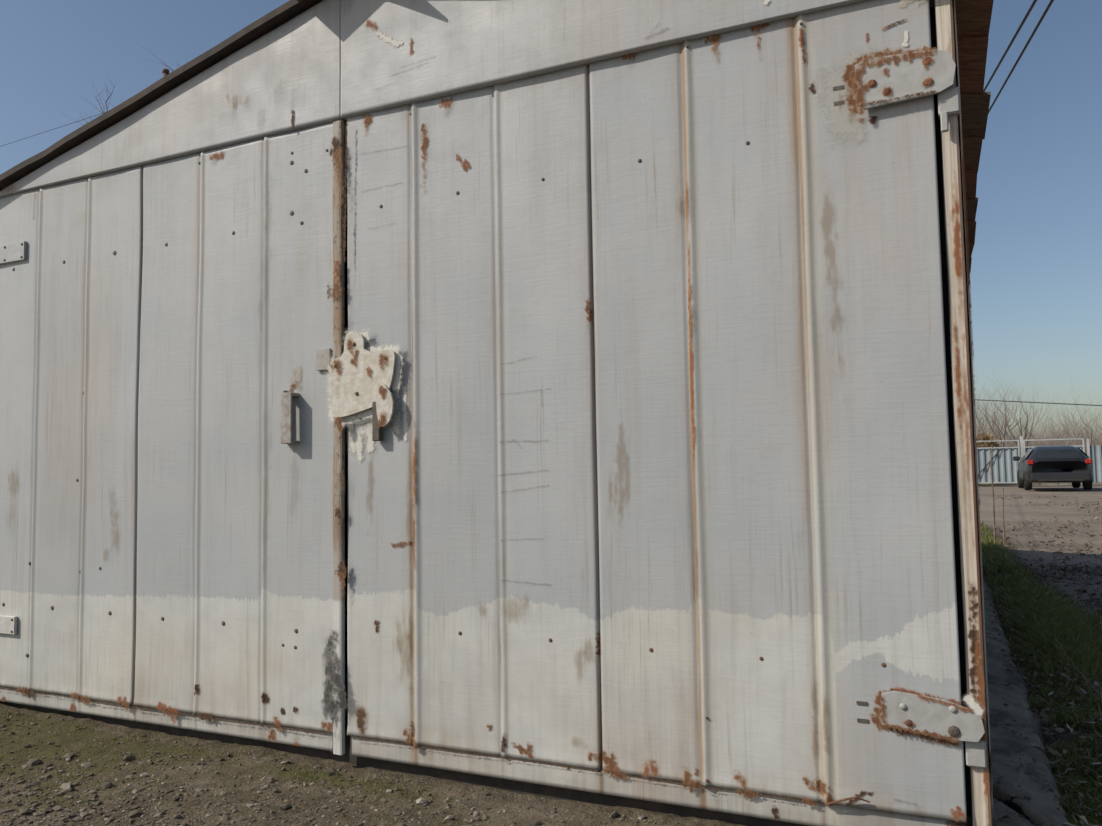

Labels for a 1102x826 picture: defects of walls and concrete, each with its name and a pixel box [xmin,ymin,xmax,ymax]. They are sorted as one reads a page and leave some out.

corrosion [705,34,720,53]
corrosion [798,28,806,64]
corrosion [842,33,936,124]
corrosion [327,122,348,299]
corrosion [952,154,978,475]
peeling [327,355,375,462]
peeling [344,331,408,441]
corrosion [354,709,484,756]
corrosion [487,725,719,793]
corrosion [734,775,833,819]
corrosion [871,586,993,821]
corrosion [947,806,966,826]